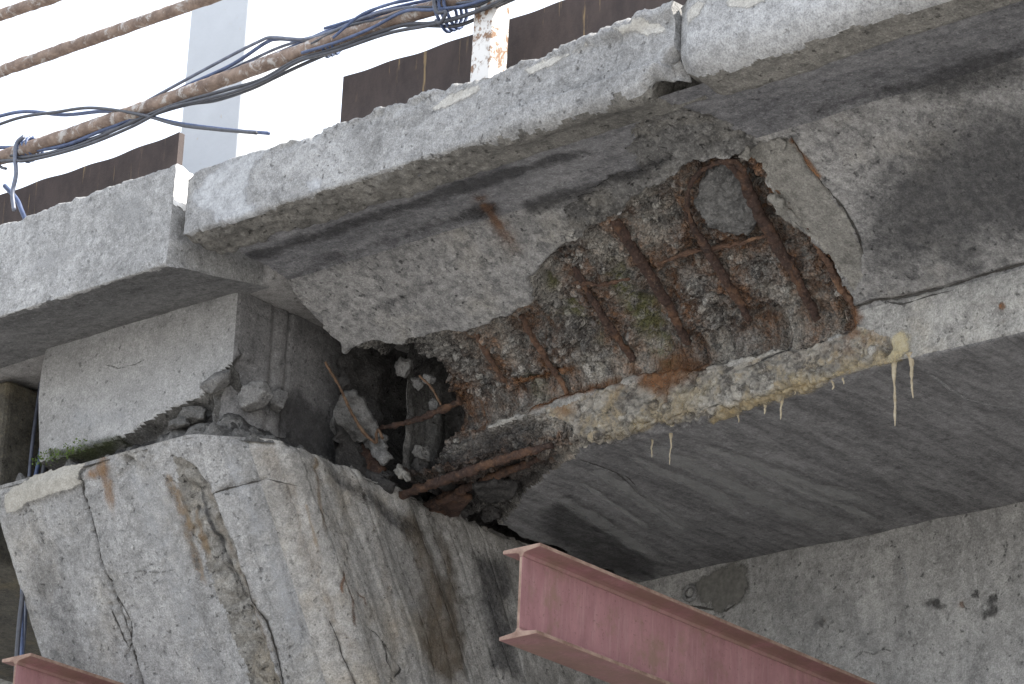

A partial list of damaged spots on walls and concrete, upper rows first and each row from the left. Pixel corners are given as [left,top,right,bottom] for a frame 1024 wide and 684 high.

water stain [246,152,590,260]
crack [819,179,862,247]
spalling [329,107,904,526]
crack [855,263,1024,308]
spalling [3,354,336,513]
corrosion [531,380,618,409]
corrosion [638,357,705,394]
water stain [710,332,909,425]
crack [213,479,301,494]
crack [83,484,173,669]
crack [246,580,283,684]